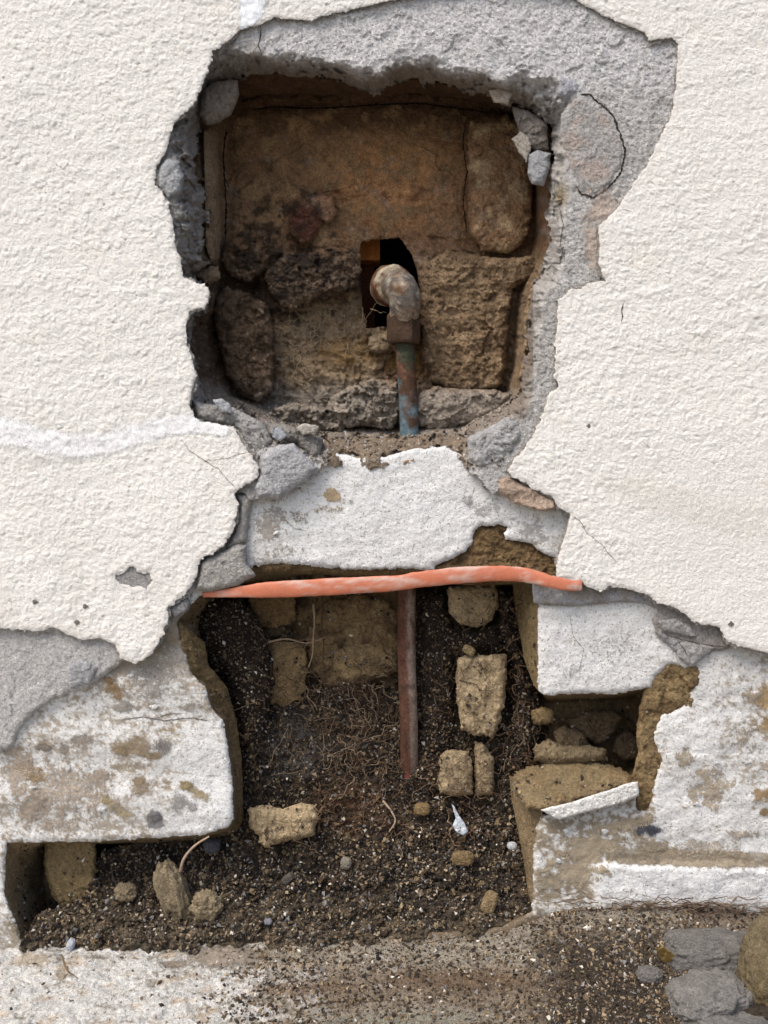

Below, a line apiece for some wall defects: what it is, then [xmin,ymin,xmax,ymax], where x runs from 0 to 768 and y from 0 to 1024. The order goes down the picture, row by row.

spalling [158,0,677,592]
crack [559,93,626,258]
spalling [0,596,318,940]
spalling [239,591,398,707]
spalling [414,581,764,924]